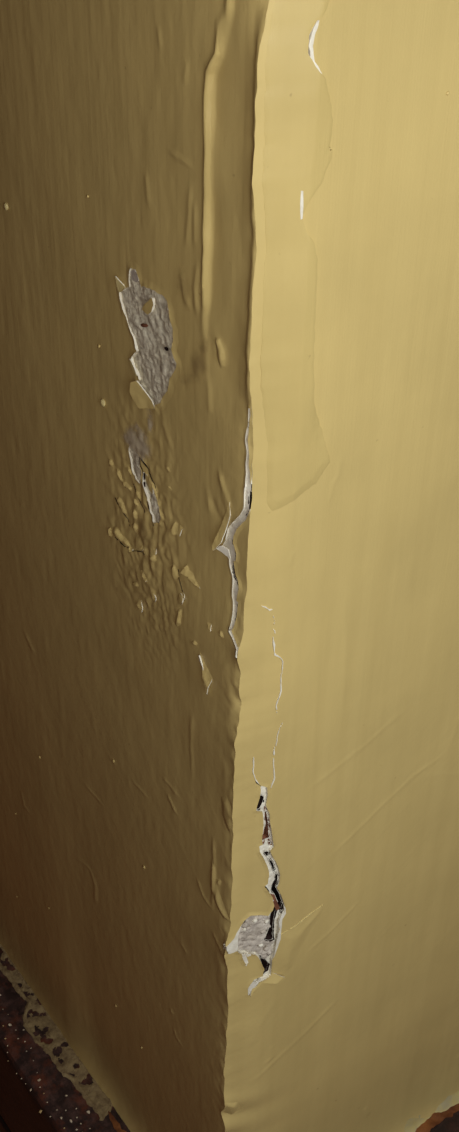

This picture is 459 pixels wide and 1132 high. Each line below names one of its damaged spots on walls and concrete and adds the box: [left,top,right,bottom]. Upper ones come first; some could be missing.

peeling [107,260,183,612]
peeling [171,564,200,627]
peeling [192,640,213,695]
crack [212,403,287,918]